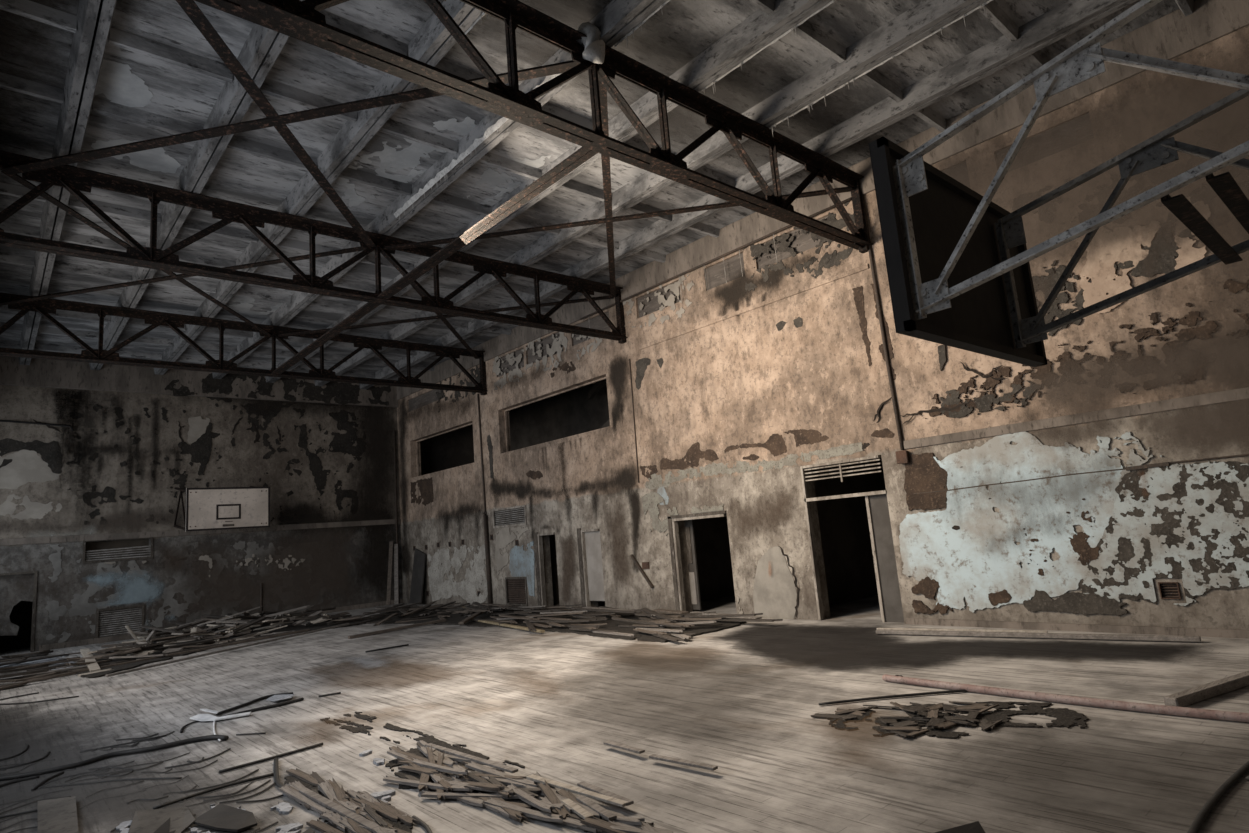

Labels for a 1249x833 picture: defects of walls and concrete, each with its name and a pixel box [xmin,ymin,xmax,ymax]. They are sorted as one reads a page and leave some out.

flaking render [743,201,855,291]
peeling [917,231,1249,419]
peeling [0,404,169,525]
peeling [120,403,365,524]
leakage [56,373,468,614]
flaking render [640,428,894,536]
crack [779,546,799,619]
peeling [899,431,1249,616]